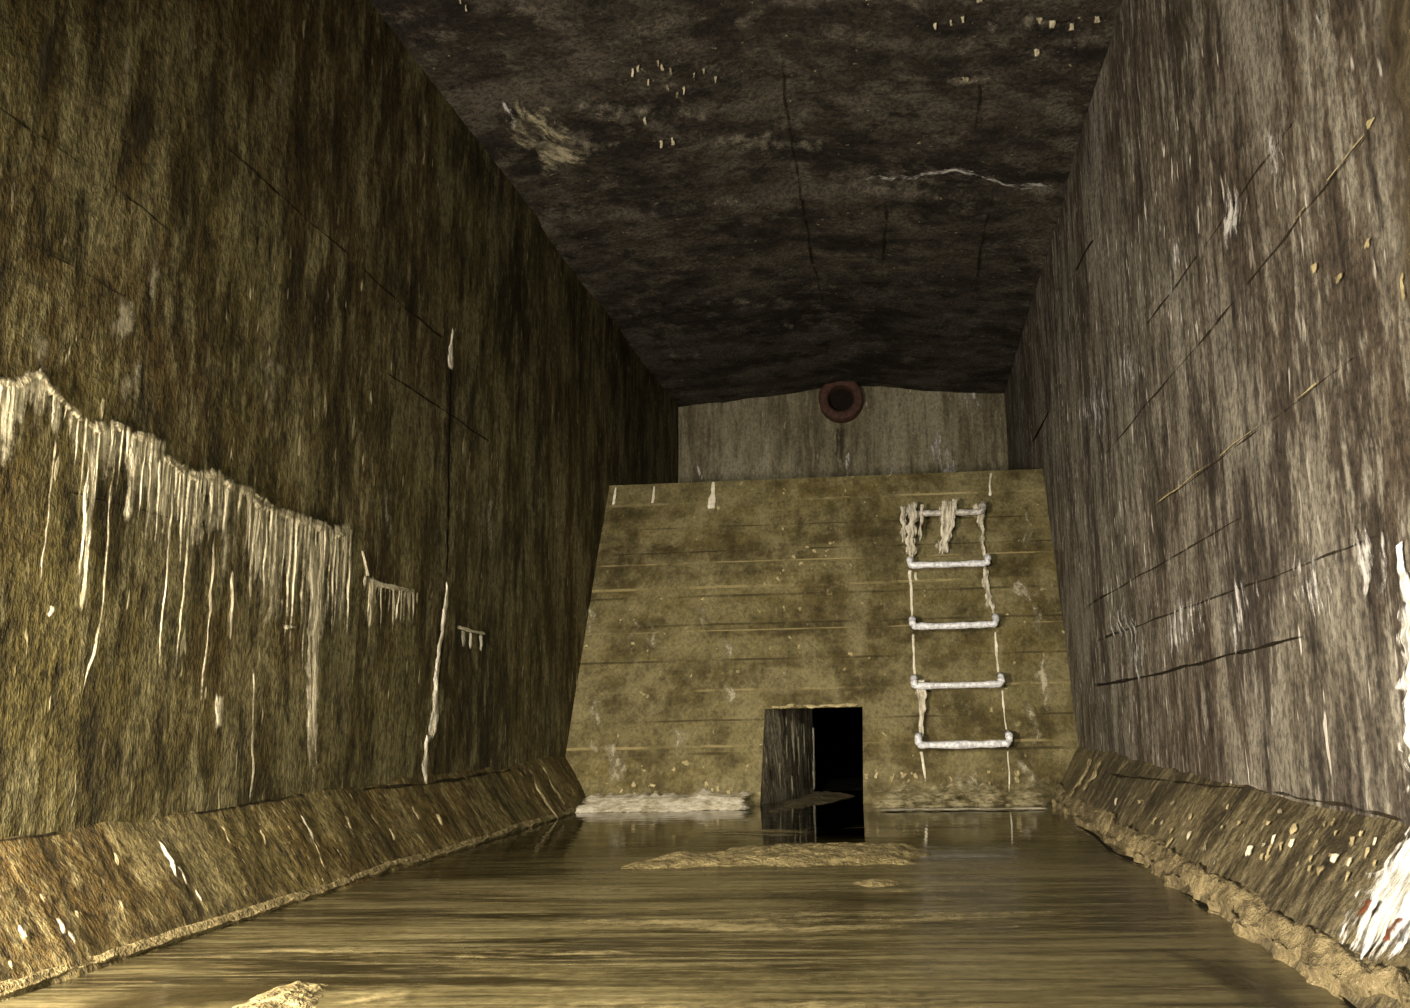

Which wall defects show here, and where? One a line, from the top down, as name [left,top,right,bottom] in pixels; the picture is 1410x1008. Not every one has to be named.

crack [28,242,125,297]
leakage [117,301,134,337]
leakage [151,263,159,298]
crack [782,72,823,301]
crack [227,148,488,694]
leakage [0,342,418,765]
leakage [422,582,485,784]
leakage [897,473,995,616]
leakage [864,634,1048,811]
leakage [1013,582,1041,623]